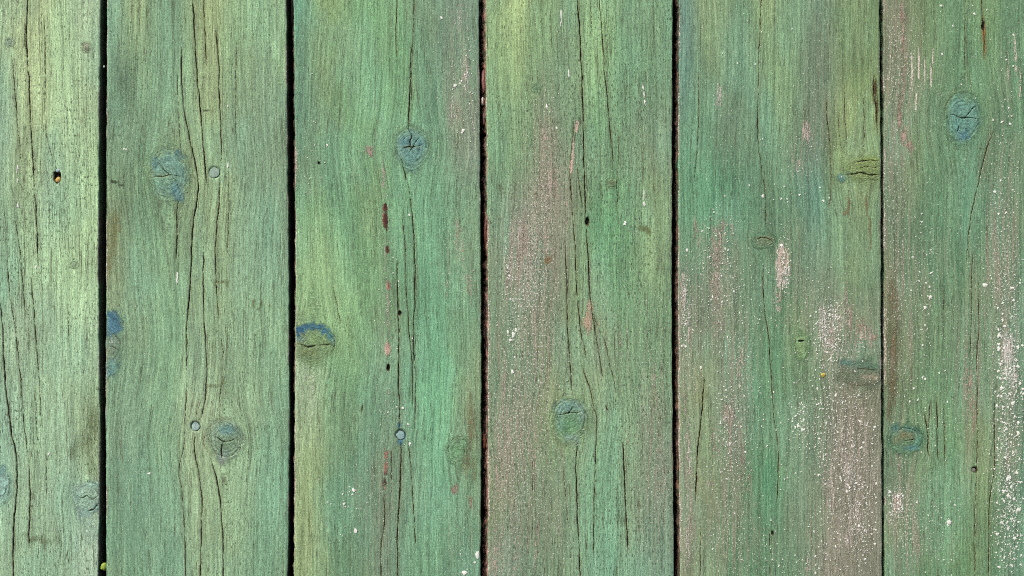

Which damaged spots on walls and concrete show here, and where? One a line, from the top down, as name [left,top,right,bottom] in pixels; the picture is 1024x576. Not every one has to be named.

crack [1,0,52,576]
crack [157,0,237,576]
crack [380,4,416,576]
crack [563,0,619,576]
crack [967,133,993,360]